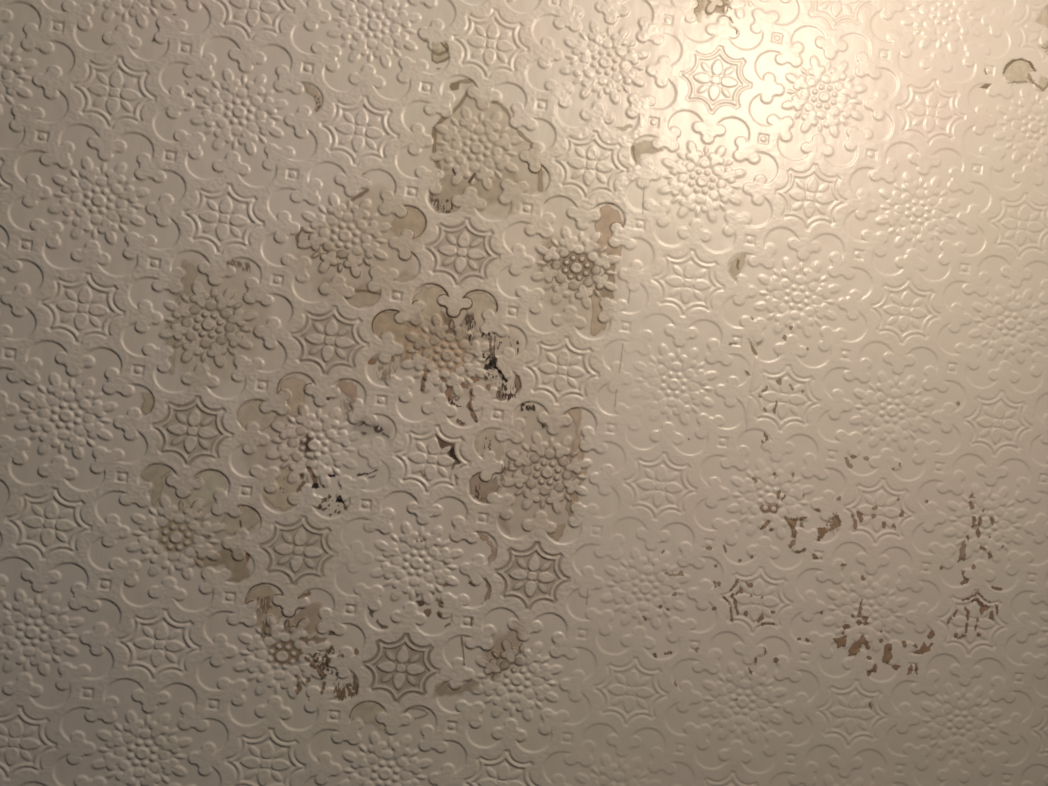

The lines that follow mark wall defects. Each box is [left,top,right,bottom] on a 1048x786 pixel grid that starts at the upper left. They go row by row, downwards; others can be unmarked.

peeling [760,490,904,559]
peeling [947,494,1002,639]
peeling [295,631,359,700]
peeling [416,583,450,627]
peeling [712,579,775,625]
peeling [833,599,935,676]